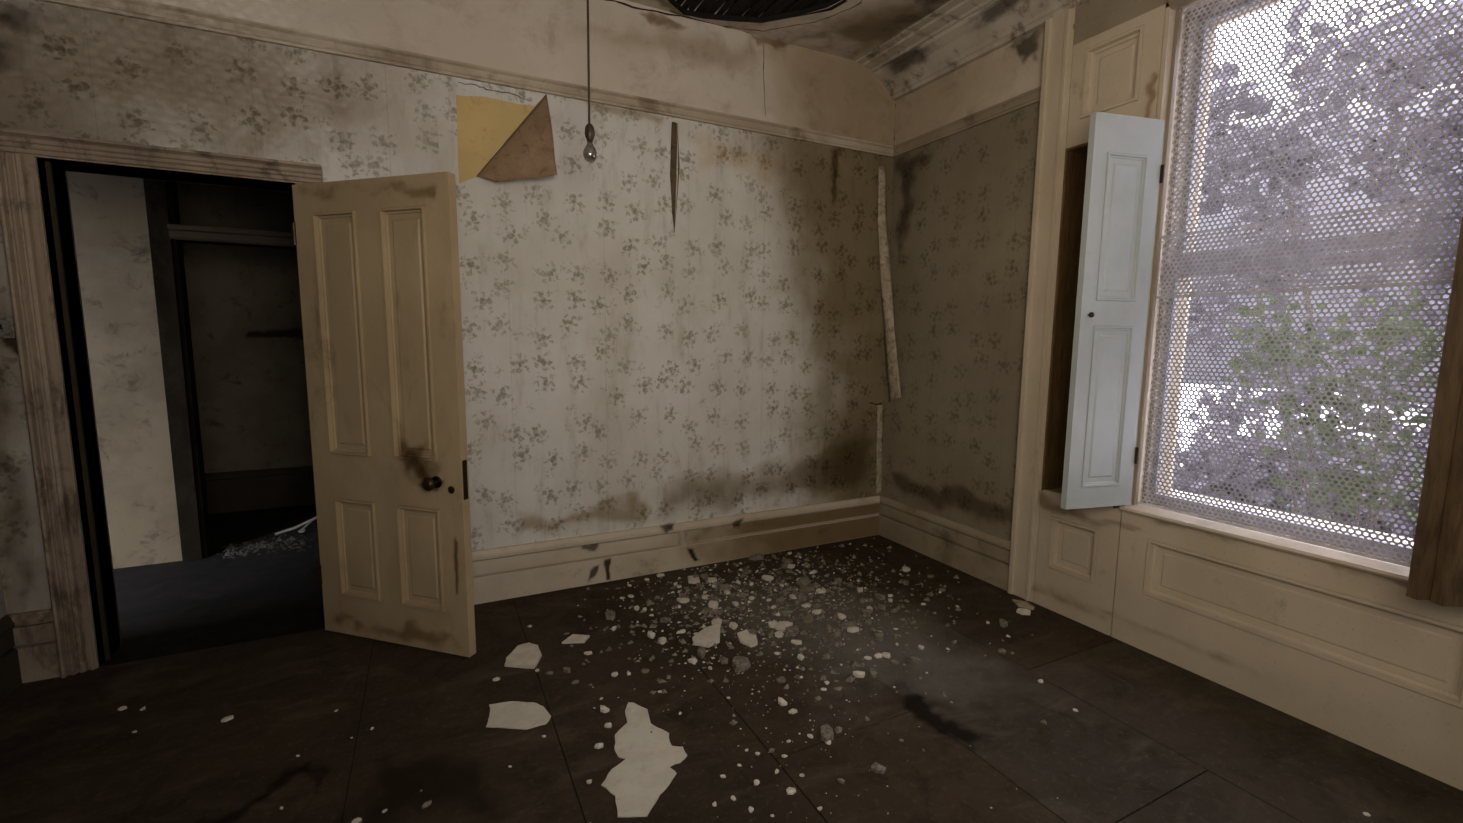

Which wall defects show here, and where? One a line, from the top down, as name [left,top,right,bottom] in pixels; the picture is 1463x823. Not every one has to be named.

mould [1014,31,1038,60]
leakage [799,143,923,501]
peeling [876,166,901,494]